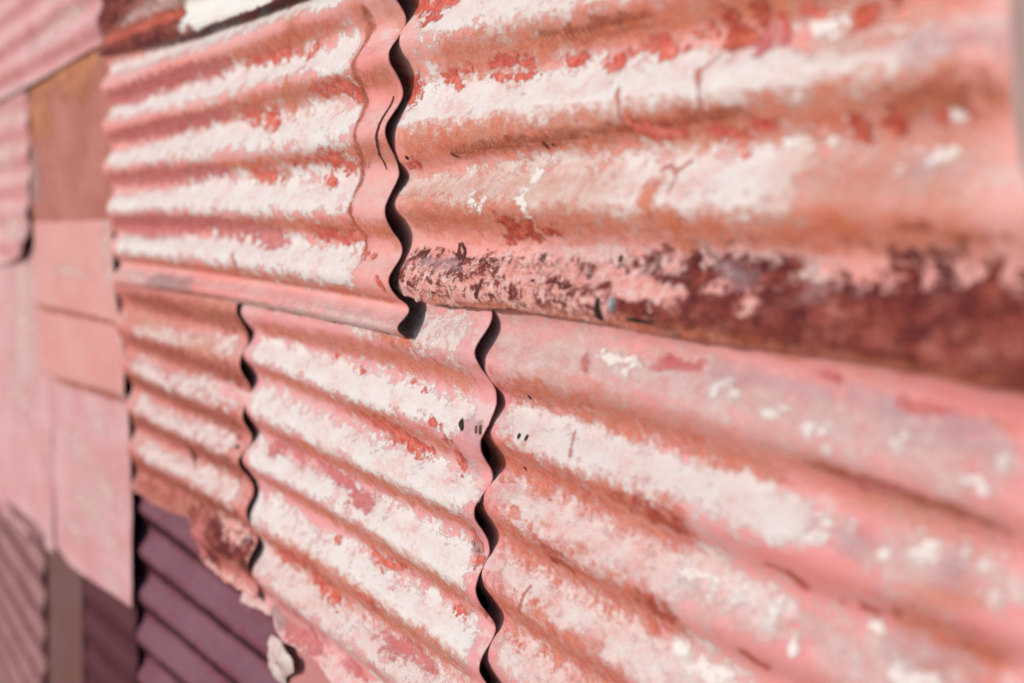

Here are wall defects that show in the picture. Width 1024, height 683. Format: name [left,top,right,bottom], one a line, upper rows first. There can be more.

peeling [101,0,377,295]
rust [441,0,814,80]
peeling [396,0,966,291]
rust [403,56,996,162]
peeling [929,106,982,126]
rust [124,202,1024,391]
rust [52,370,473,607]
rust [129,451,461,667]
peeling [130,296,1022,683]